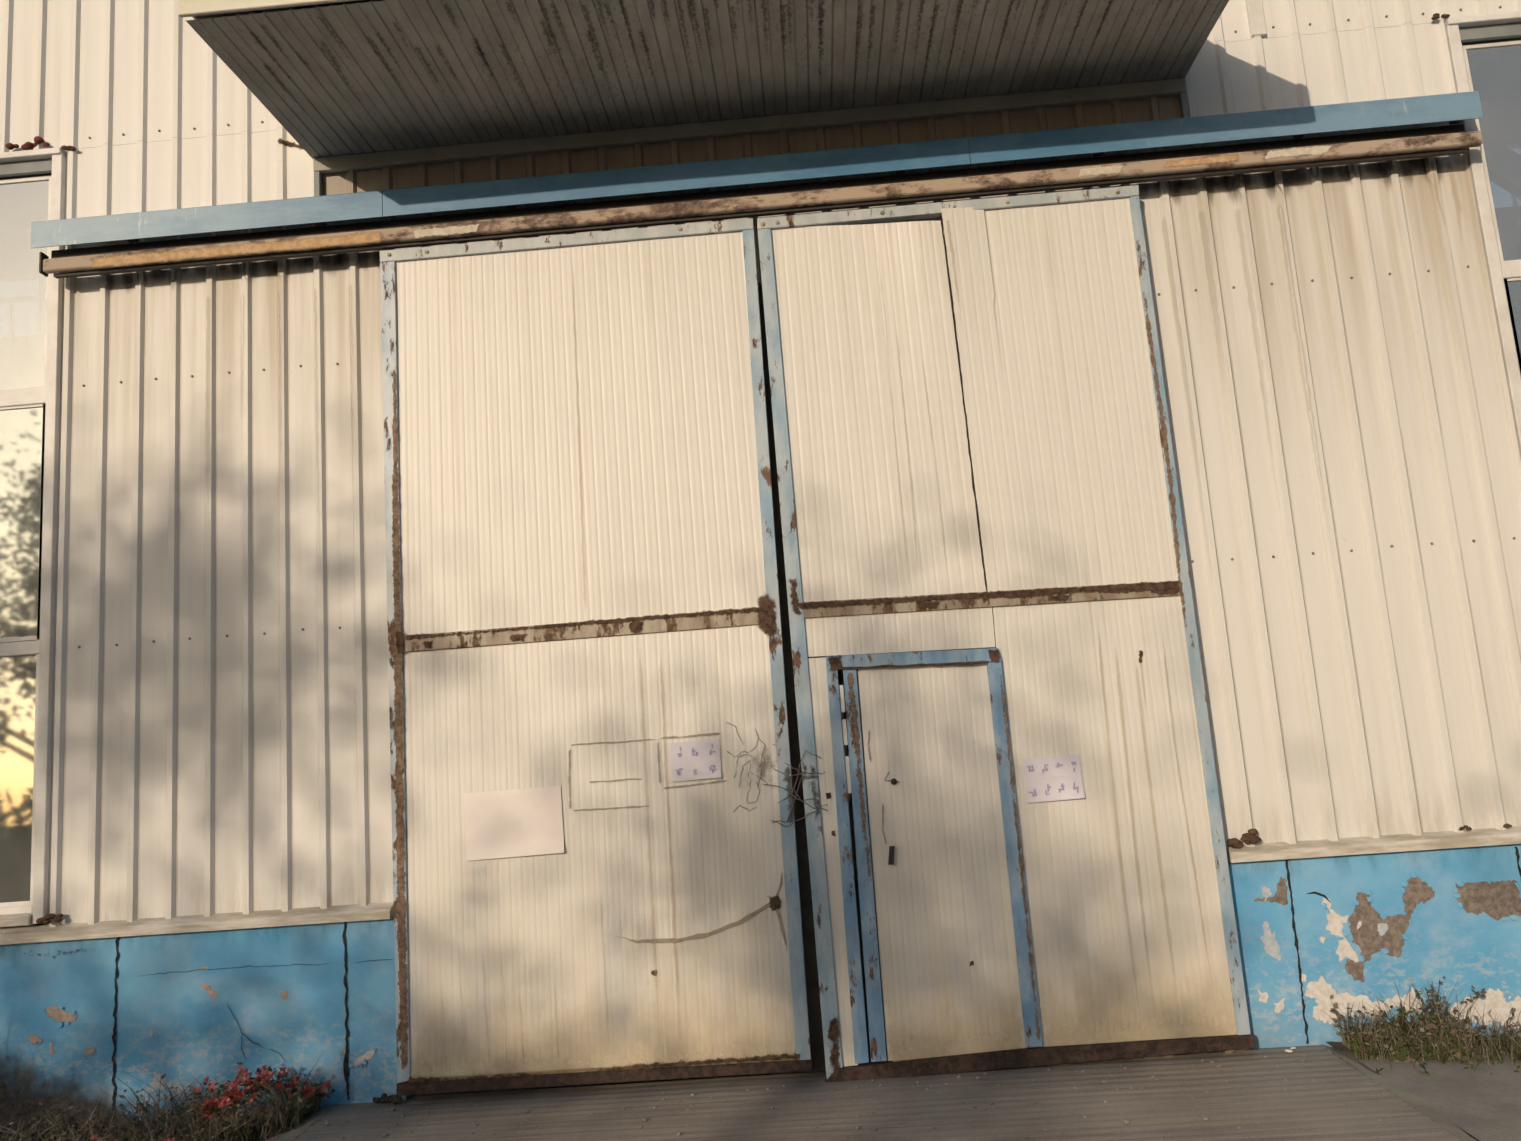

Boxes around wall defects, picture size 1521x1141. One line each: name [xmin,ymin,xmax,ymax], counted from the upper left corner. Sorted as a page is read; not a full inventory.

water stain [1155,156,1439,194]
rust [92,232,381,267]
rust [412,224,479,238]
rust [392,300,1187,1084]
crack [1513,846,1521,876]
peeling [1254,876,1288,961]
crack [1285,860,1330,1044]
spalling [1302,872,1521,1037]
peeling [1256,989,1285,1013]
peeling [28,1006,77,1055]
crack [111,922,392,1132]